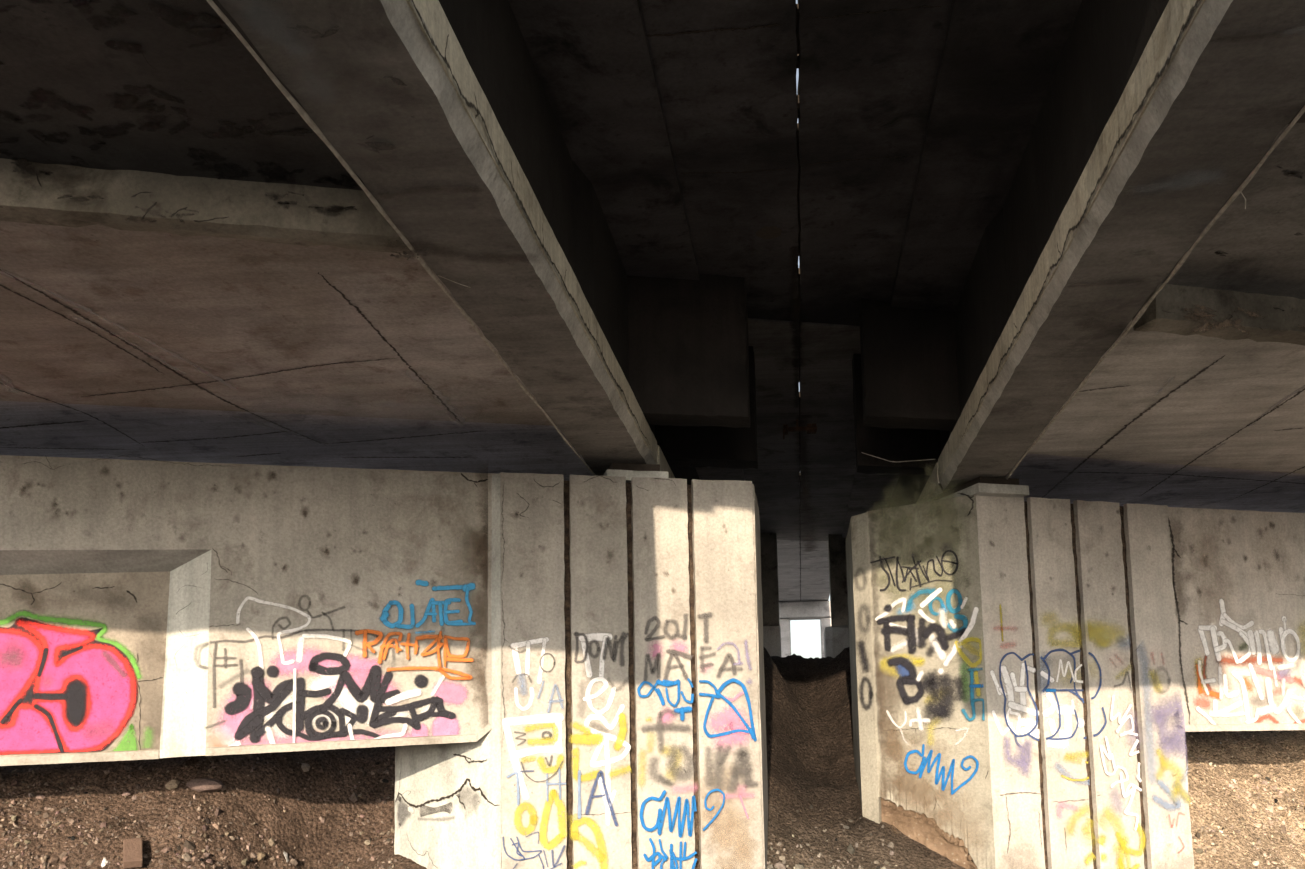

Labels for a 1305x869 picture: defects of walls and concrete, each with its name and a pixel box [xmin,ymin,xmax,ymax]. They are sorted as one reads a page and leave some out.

crack [132,192,228,222]
crack [0,269,676,868]
crack [412,0,650,445]
crack [962,0,1202,437]
crack [1042,355,1305,500]
crack [1168,519,1190,724]